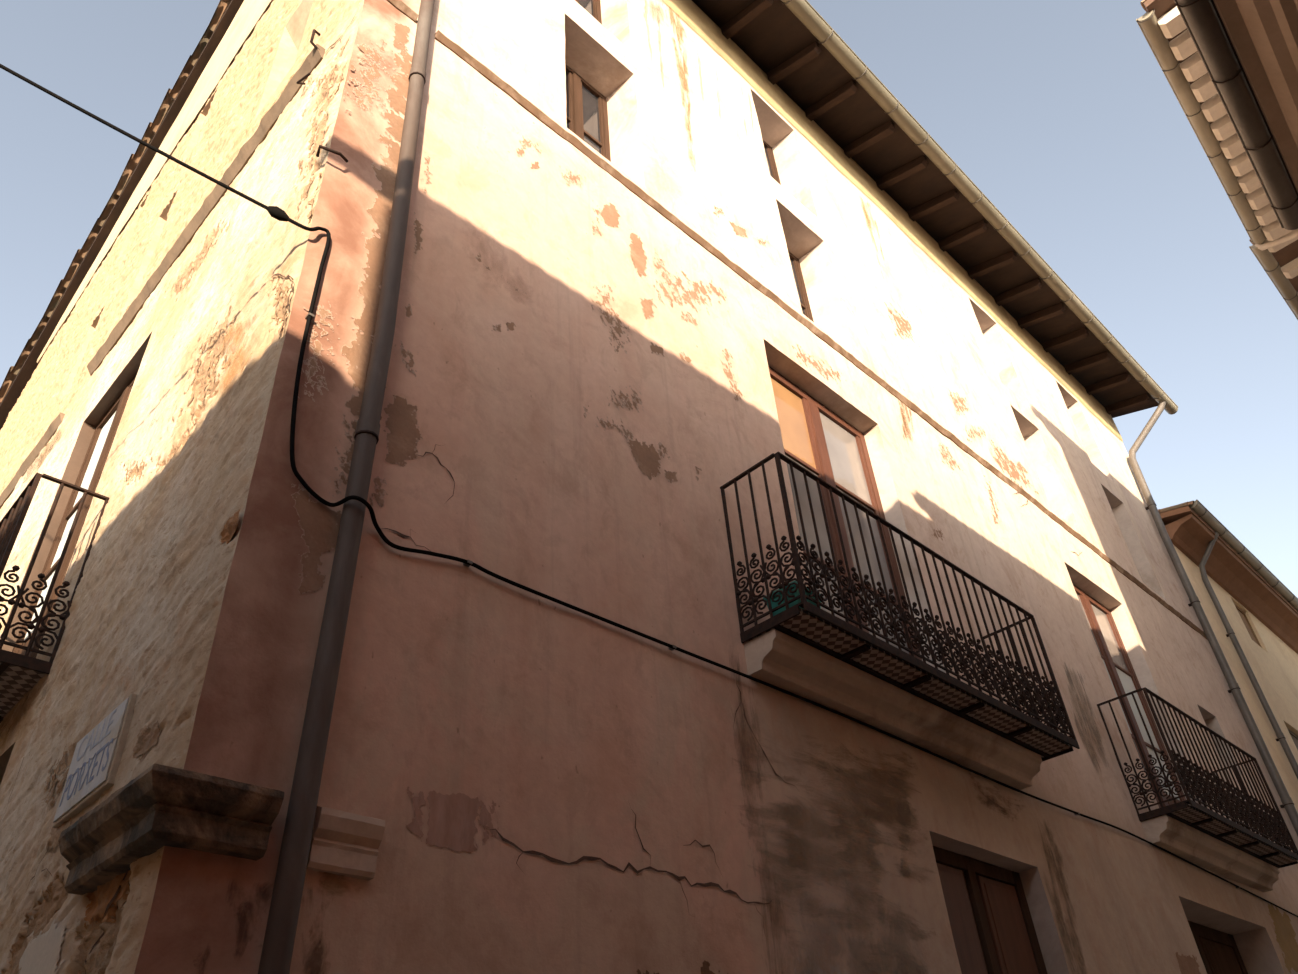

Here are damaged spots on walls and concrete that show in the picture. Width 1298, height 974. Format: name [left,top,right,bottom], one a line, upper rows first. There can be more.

peeling [559,166,586,187]
flaking render [267,276,293,341]
peeling [293,22,413,483]
peeling [589,284,635,354]
peeling [591,203,726,326]
peeling [650,342,692,368]
peeling [719,348,746,402]
peeling [369,387,423,507]
crack [416,444,455,501]
peeling [583,385,678,483]
crack [490,807,778,932]
flaking render [1,867,131,974]